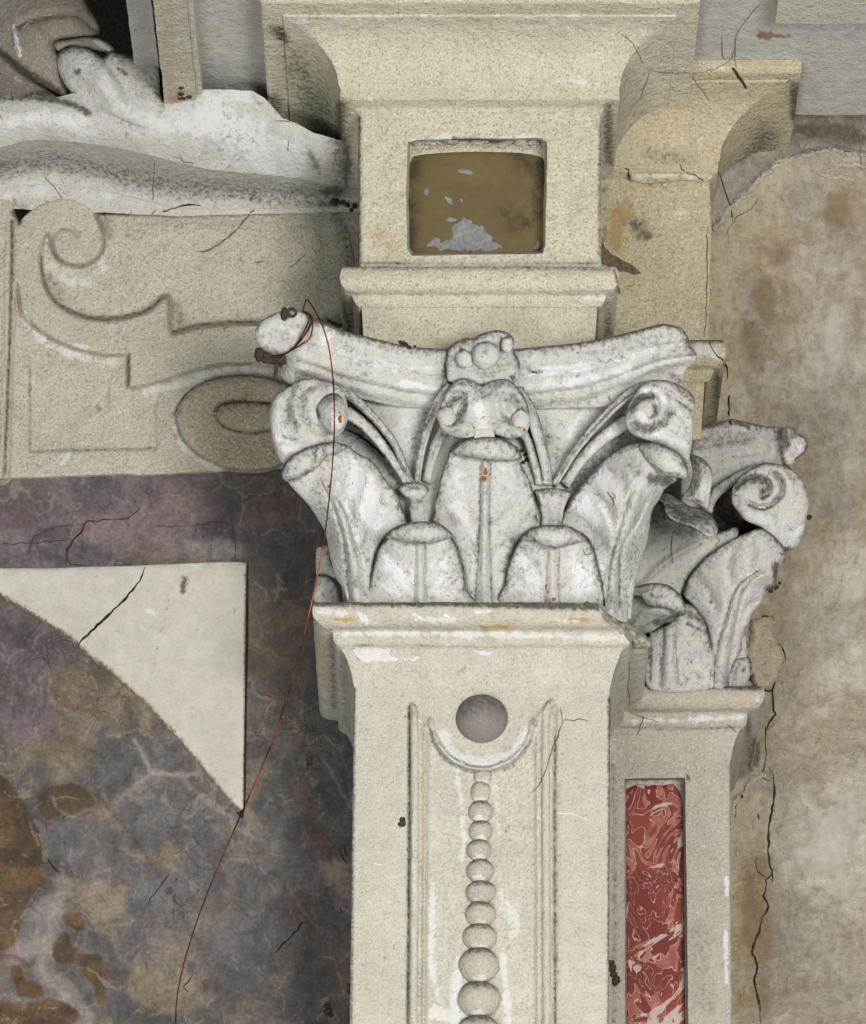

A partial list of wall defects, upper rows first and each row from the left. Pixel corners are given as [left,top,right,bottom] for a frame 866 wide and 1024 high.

crack [198,209,255,253]
peeling [427,217,503,253]
crack [624,165,759,425]
crack [1,508,140,566]
crack [164,521,236,550]
crack [77,567,145,647]
crack [529,707,587,796]
crack [734,615,786,1023]